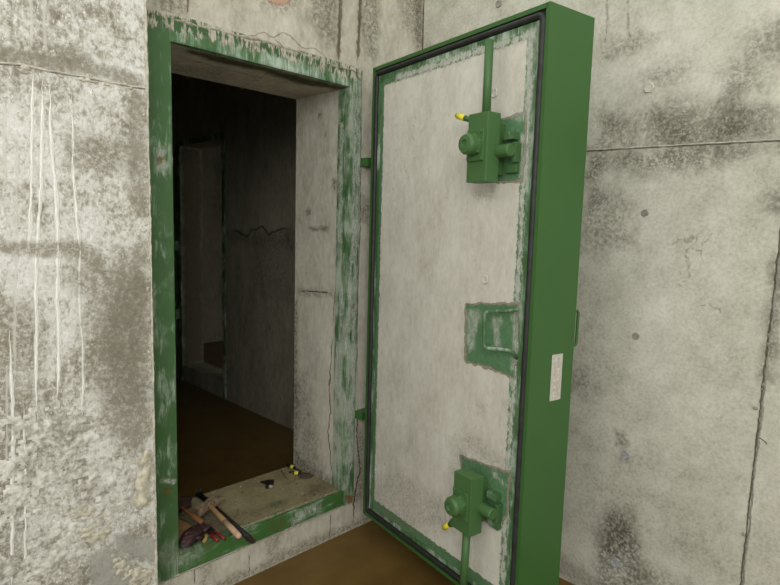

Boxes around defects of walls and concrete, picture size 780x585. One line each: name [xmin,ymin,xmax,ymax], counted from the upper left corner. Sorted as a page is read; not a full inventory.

peeling [146,6,362,83]
water stain [0,46,152,475]
crack [358,168,367,283]
water stain [0,474,27,559]
crack [326,342,334,469]
crack [353,408,361,520]
water stain [600,515,640,585]
crack [740,230,780,585]